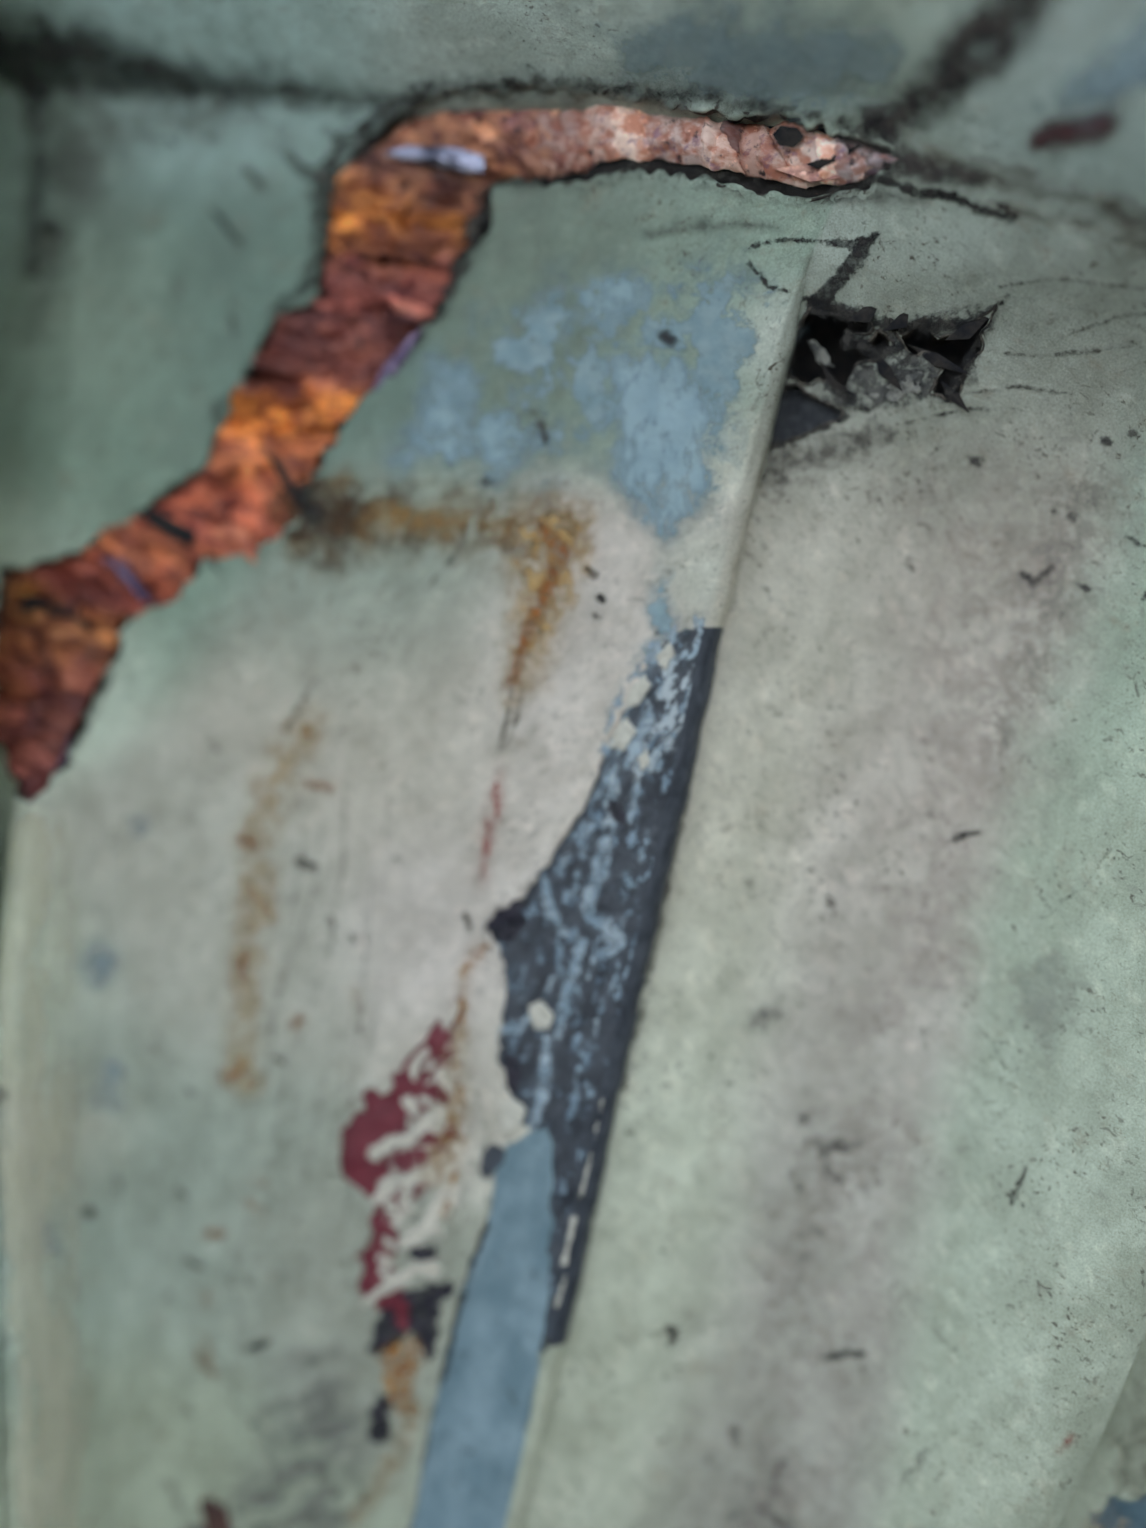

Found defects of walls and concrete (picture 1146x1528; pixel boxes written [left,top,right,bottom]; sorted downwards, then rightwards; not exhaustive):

crack [0,17,381,266]
crack [597,0,1043,314]
crack [1077,196,1144,225]
peeling [768,305,997,450]
crack [938,285,1146,416]
corrosion [275,475,585,749]
peeling [326,583,705,1528]
corrosion [165,1480,233,1528]
peeling [1090,1494,1146,1528]